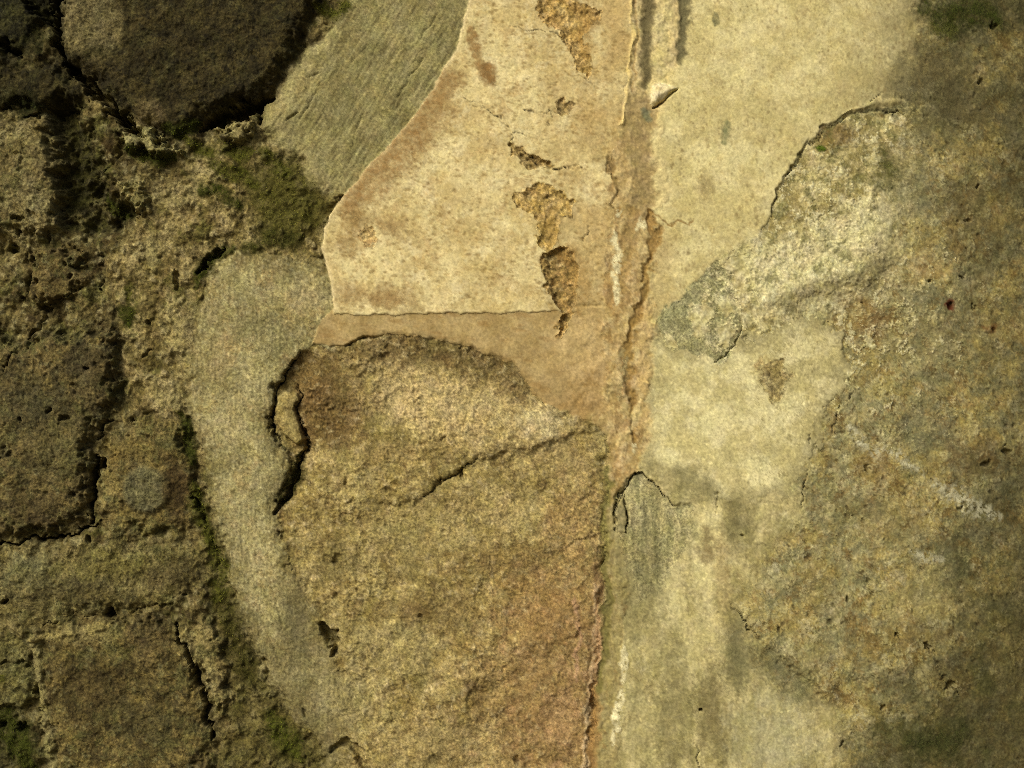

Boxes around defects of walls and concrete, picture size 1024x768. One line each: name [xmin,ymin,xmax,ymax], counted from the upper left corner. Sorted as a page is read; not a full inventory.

spalling [536,0,603,80]
spalling [508,139,580,339]